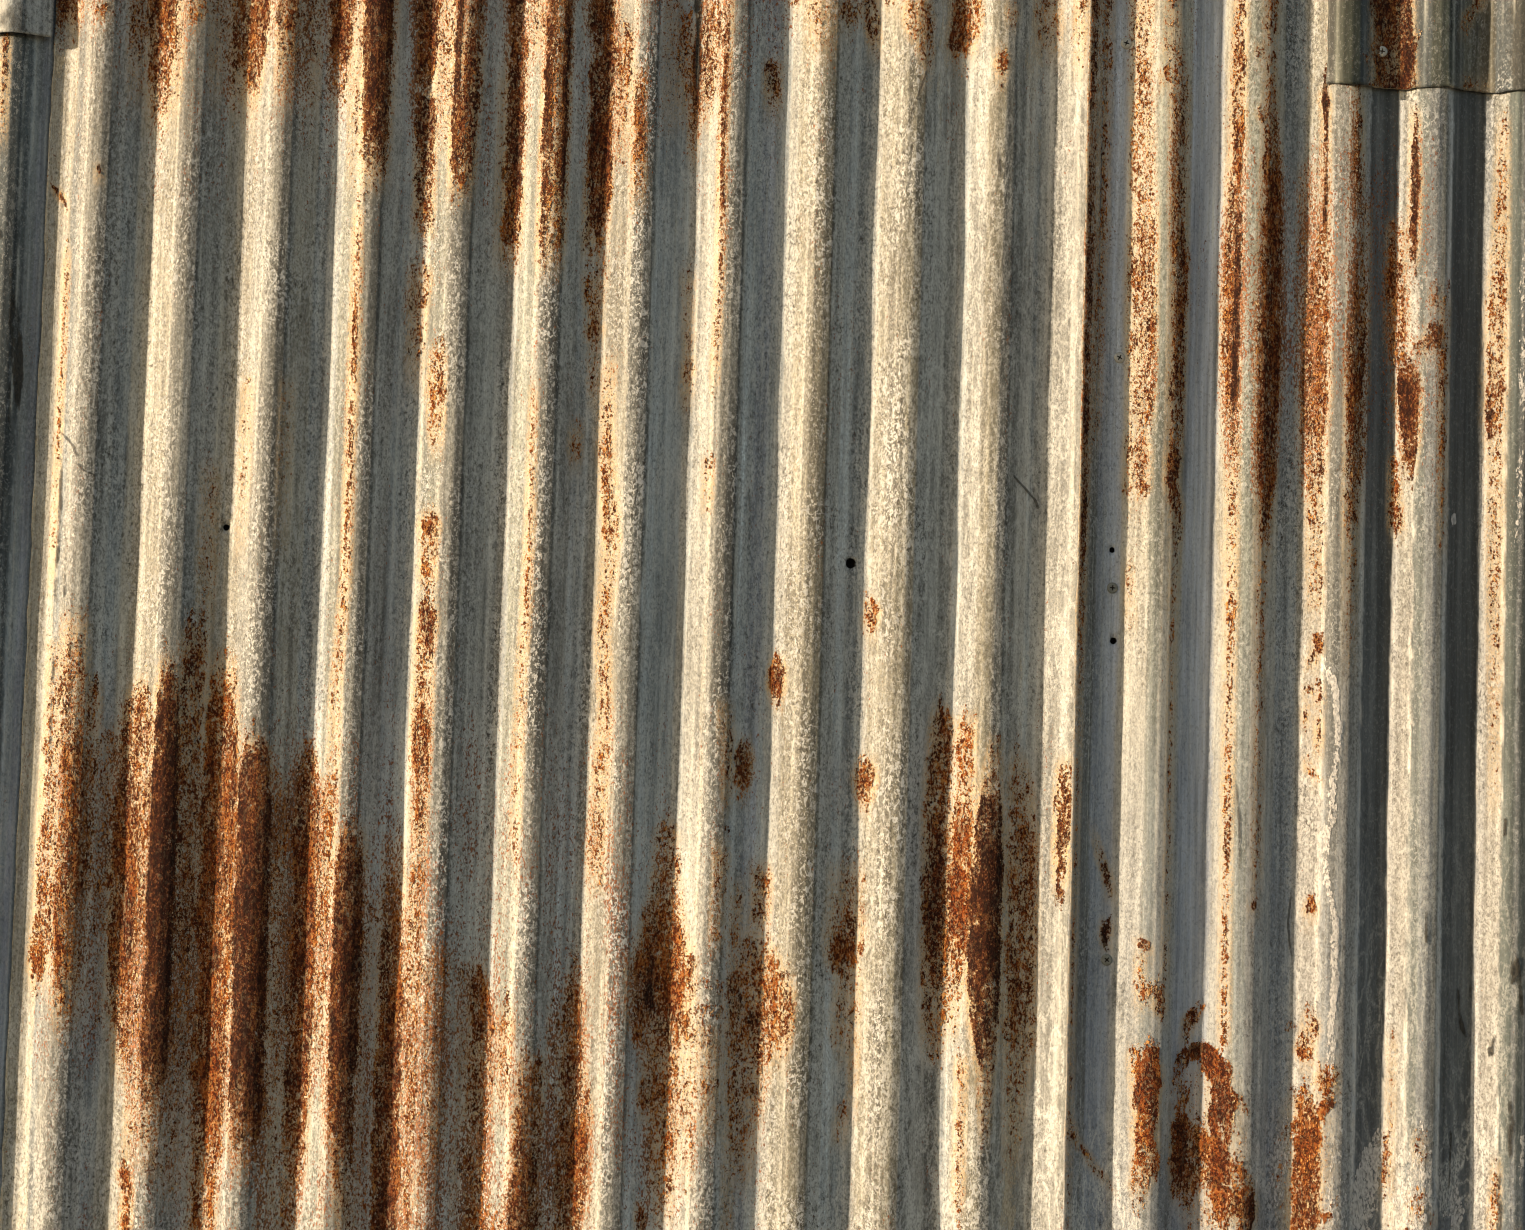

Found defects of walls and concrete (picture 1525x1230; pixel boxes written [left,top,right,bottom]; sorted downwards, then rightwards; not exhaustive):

rust [661,0,732,416]
rust [27,0,591,1230]
rust [405,0,646,898]
rust [623,806,795,1230]
rust [722,694,754,808]
rust [768,648,785,710]
rust [825,838,869,1143]
rust [854,754,875,812]
rust [916,685,1079,1228]
rust [1007,0,1450,1230]